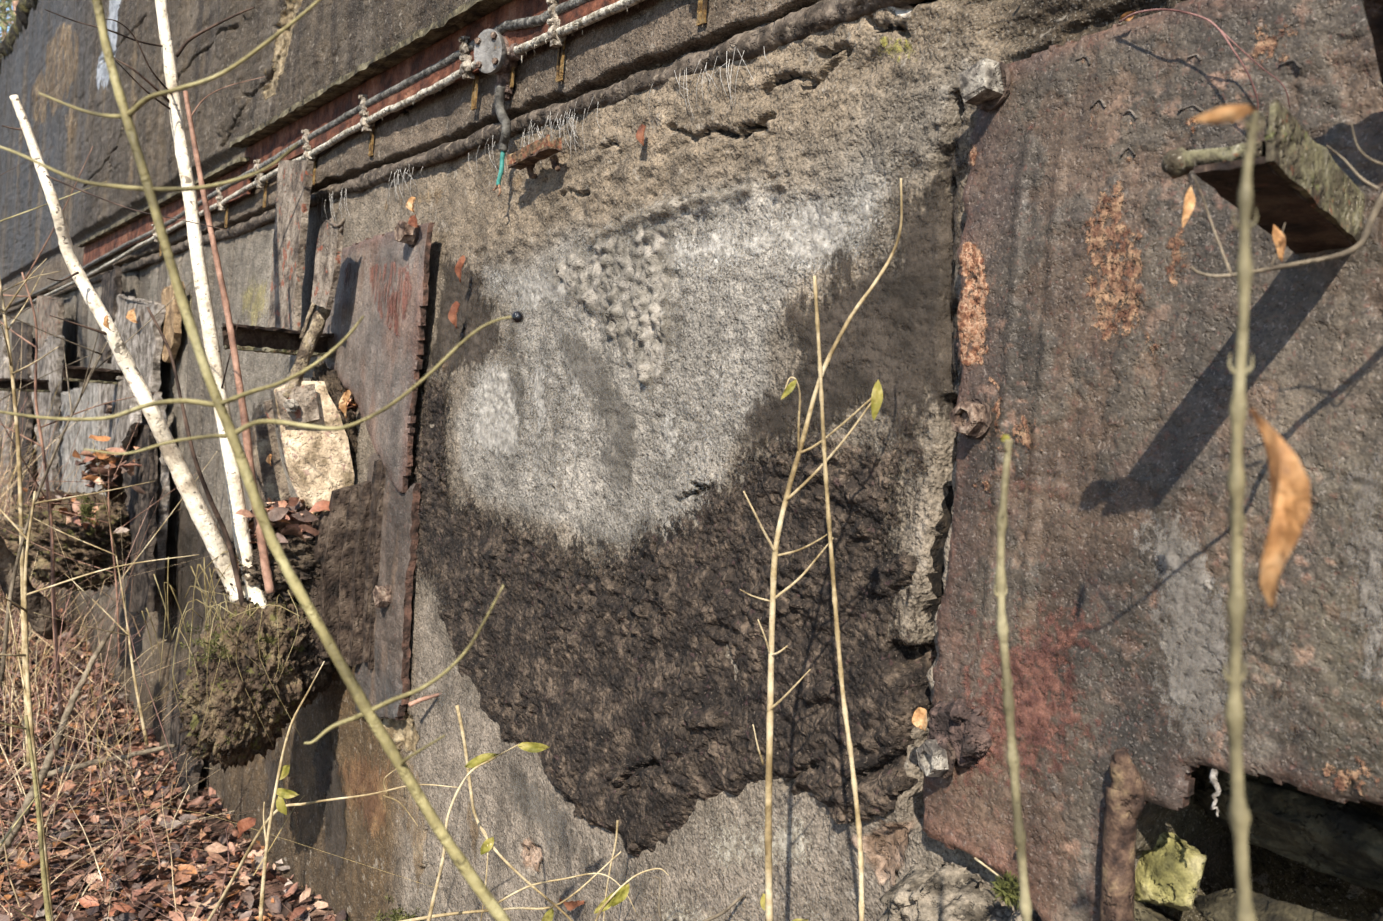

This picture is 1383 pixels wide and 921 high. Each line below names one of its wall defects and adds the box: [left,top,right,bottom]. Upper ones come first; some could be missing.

rust [343,262,412,336]
water stain [662,126,969,466]
water stain [428,244,635,485]
rust [927,593,1112,796]
water stain [509,765,586,869]
efflorescence [708,807,813,873]
efflorescence [656,894,722,921]